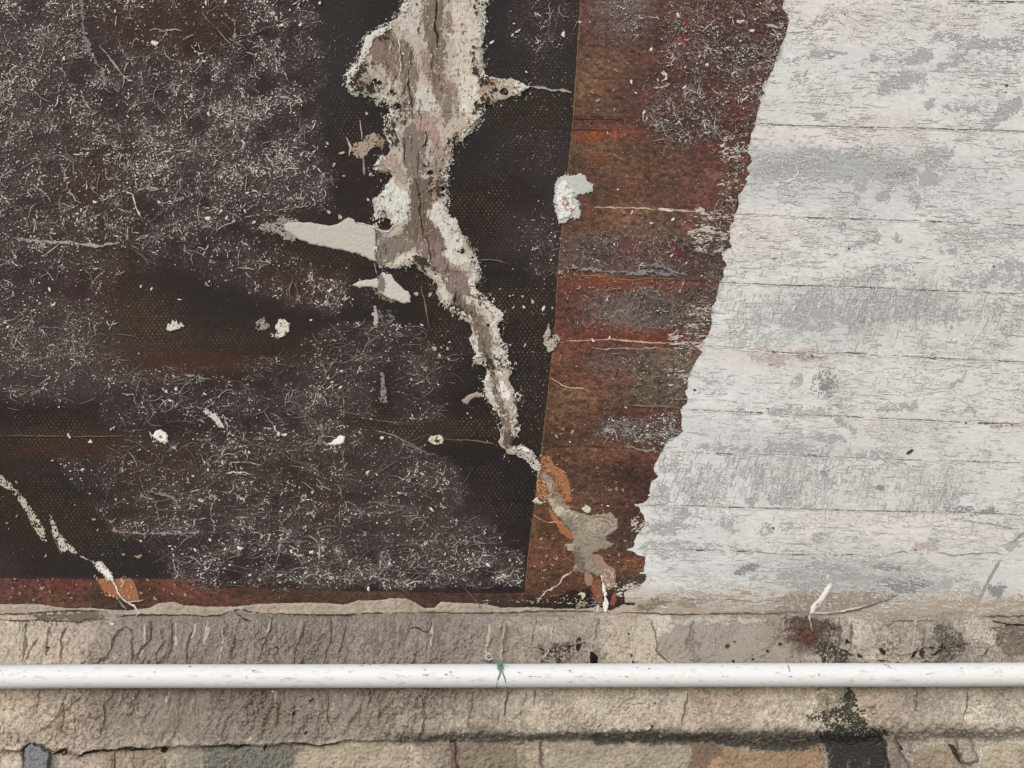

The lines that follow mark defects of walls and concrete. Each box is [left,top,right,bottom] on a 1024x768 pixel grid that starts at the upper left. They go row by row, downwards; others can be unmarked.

spalling [359,58,411,127]
hole [422,162,447,201]
rust [743,345,827,368]
peeling [536,456,574,539]
peeling [584,554,617,606]
crack [0,569,943,664]
water stain [781,615,854,663]